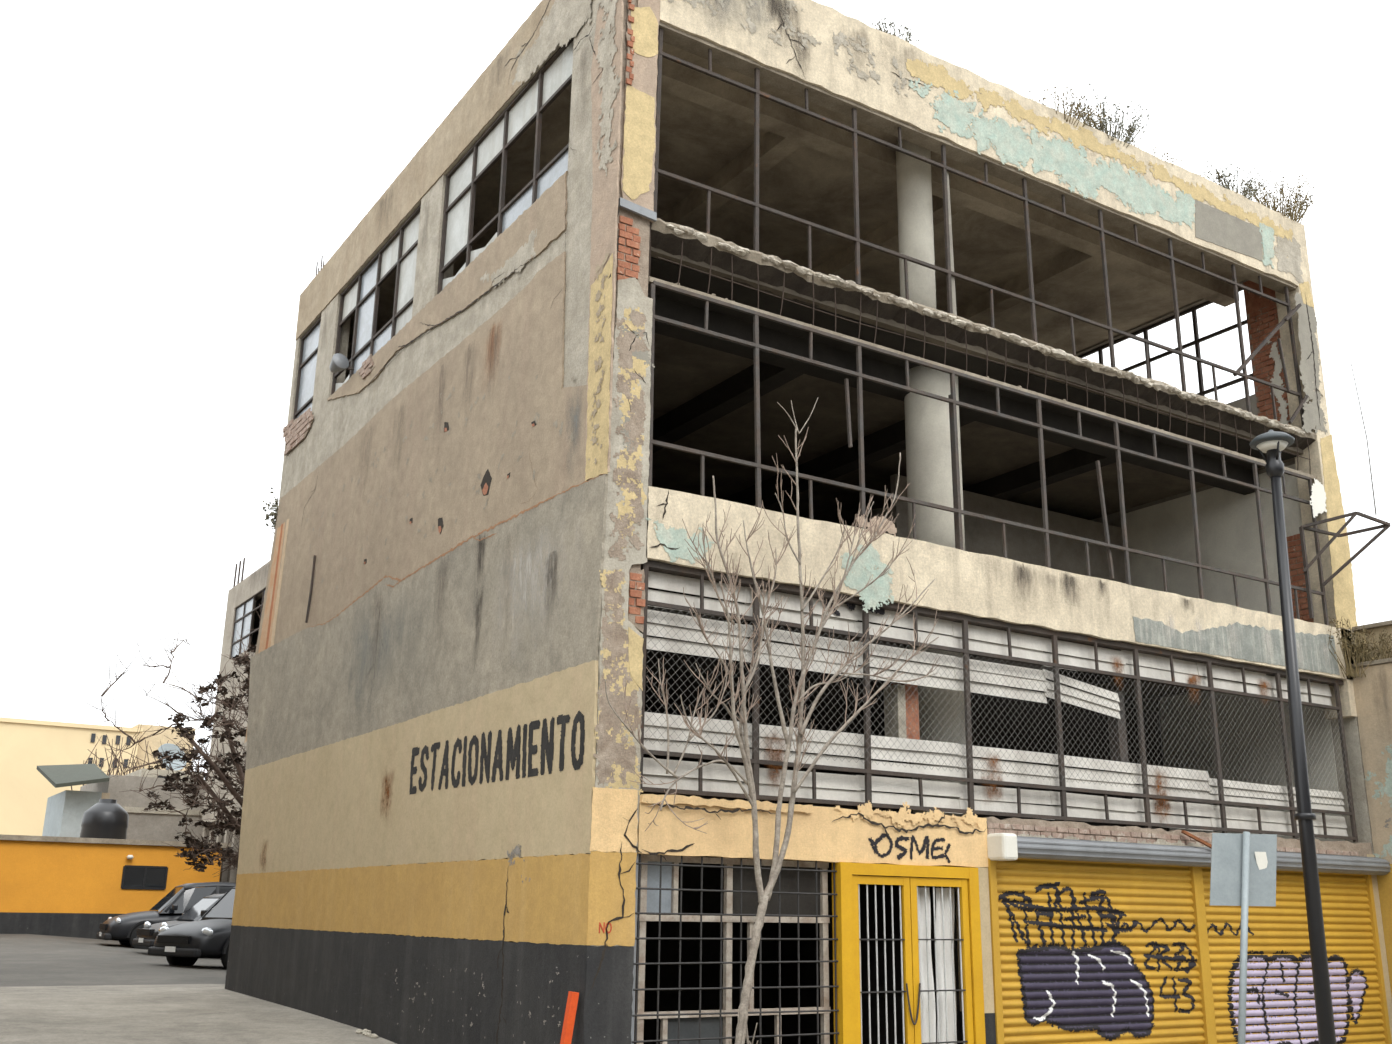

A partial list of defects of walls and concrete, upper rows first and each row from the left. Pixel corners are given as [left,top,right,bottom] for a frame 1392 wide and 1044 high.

crack [505,1,550,77]
flaking render [512,0,635,176]
crack [364,138,572,390]
flaking render [283,408,314,456]
peeling [588,0,1340,795]
flaking render [835,801,1212,847]
peeling [1277,744,1392,859]
crack [559,801,774,1035]